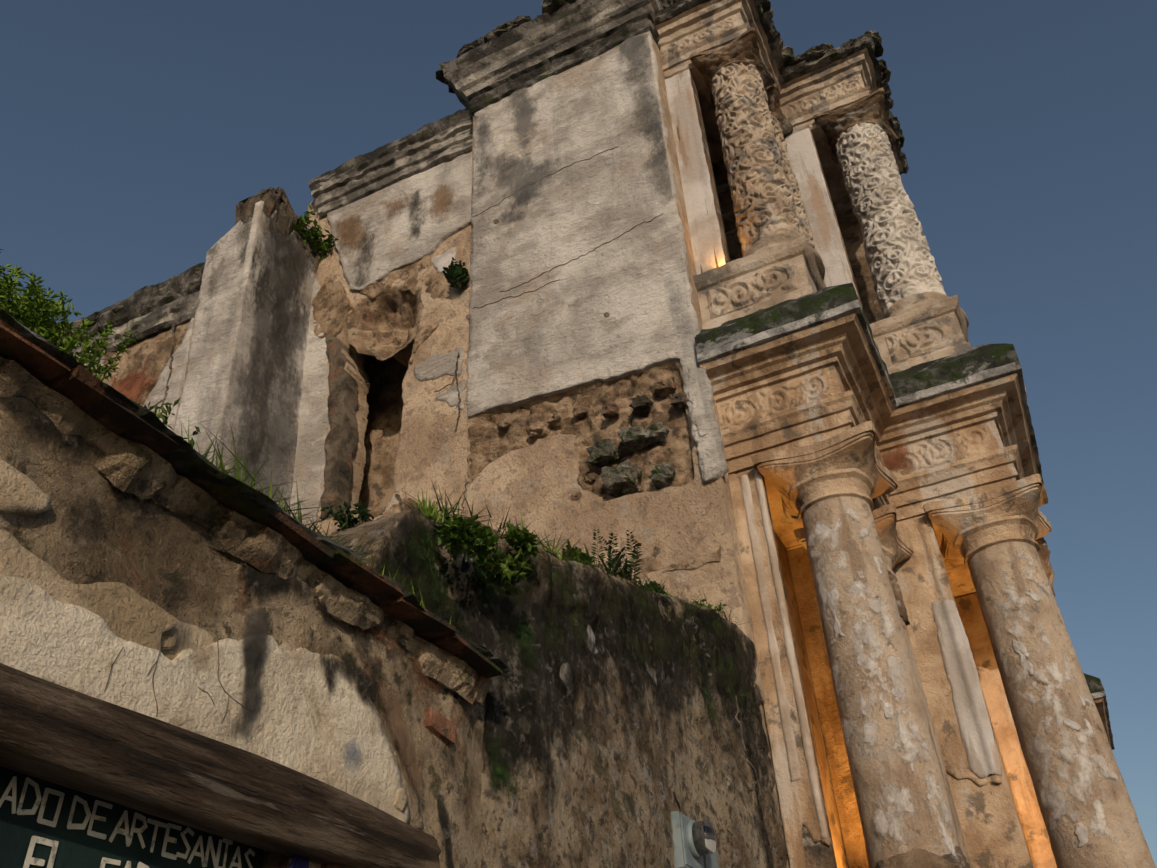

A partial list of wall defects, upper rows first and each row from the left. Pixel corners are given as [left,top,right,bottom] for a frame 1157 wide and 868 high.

peeling [336,217,367,250]
water stain [477,88,552,222]
crack [472,147,616,217]
crack [473,214,662,309]
spalling [92,337,178,407]
crack [155,322,176,414]
water stain [233,216,314,510]
spalling [311,247,467,410]
spalling [465,365,723,501]
crack [198,636,243,723]
water stain [236,610,270,734]
water stain [462,567,774,868]